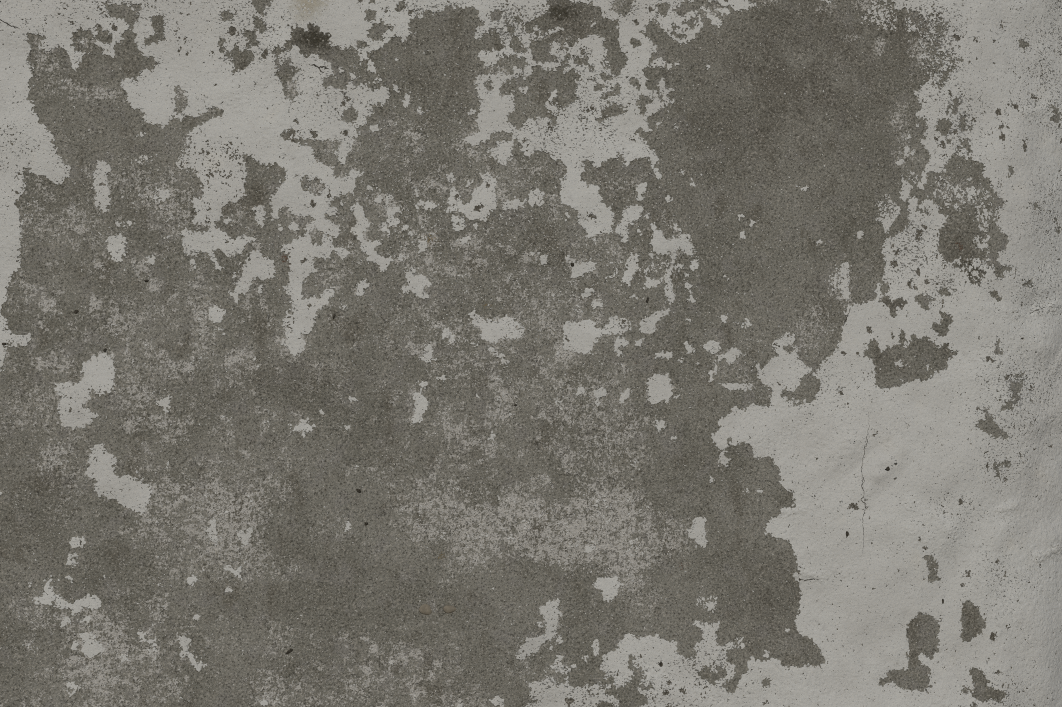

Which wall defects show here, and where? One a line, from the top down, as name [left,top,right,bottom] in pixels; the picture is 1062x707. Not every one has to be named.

peeling [980,103,1028,152]
peeling [834,524,1060,707]